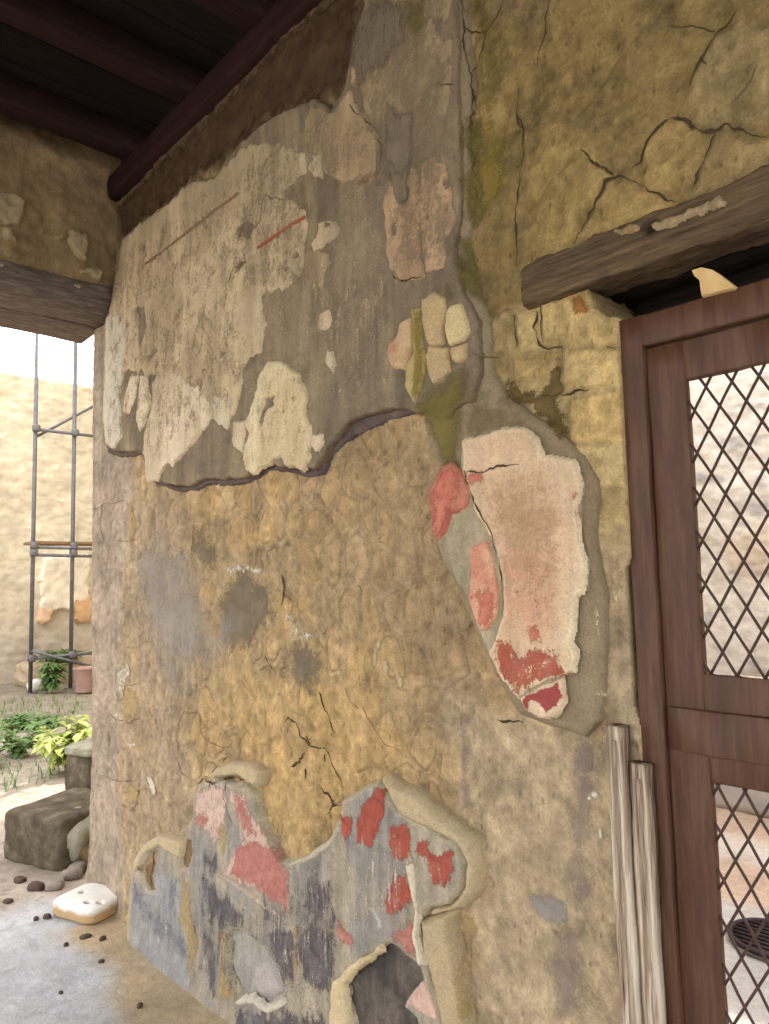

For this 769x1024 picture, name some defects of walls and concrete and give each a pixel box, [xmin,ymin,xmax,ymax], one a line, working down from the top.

peeling [0,193,27,242]
peeling [39,0,485,492]
crack [438,0,503,218]
crack [575,66,769,242]
crack [665,12,735,85]
water stain [412,310,423,396]
crack [451,305,563,358]
crack [463,464,518,616]
crack [286,688,401,815]
spalling [142,849,158,890]
spalling [184,840,193,868]
spalling [193,860,439,1024]